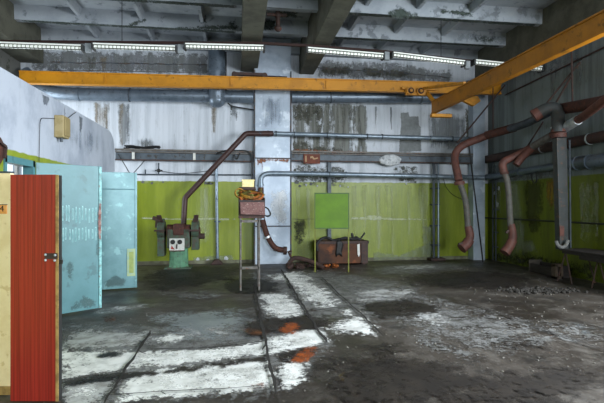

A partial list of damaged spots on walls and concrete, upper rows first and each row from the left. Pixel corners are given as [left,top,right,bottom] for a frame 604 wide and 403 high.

leakage [317,60,452,82]
leakage [118,104,129,144]
leakage [292,103,367,152]
leakage [399,112,421,152]
leakage [294,220,306,244]